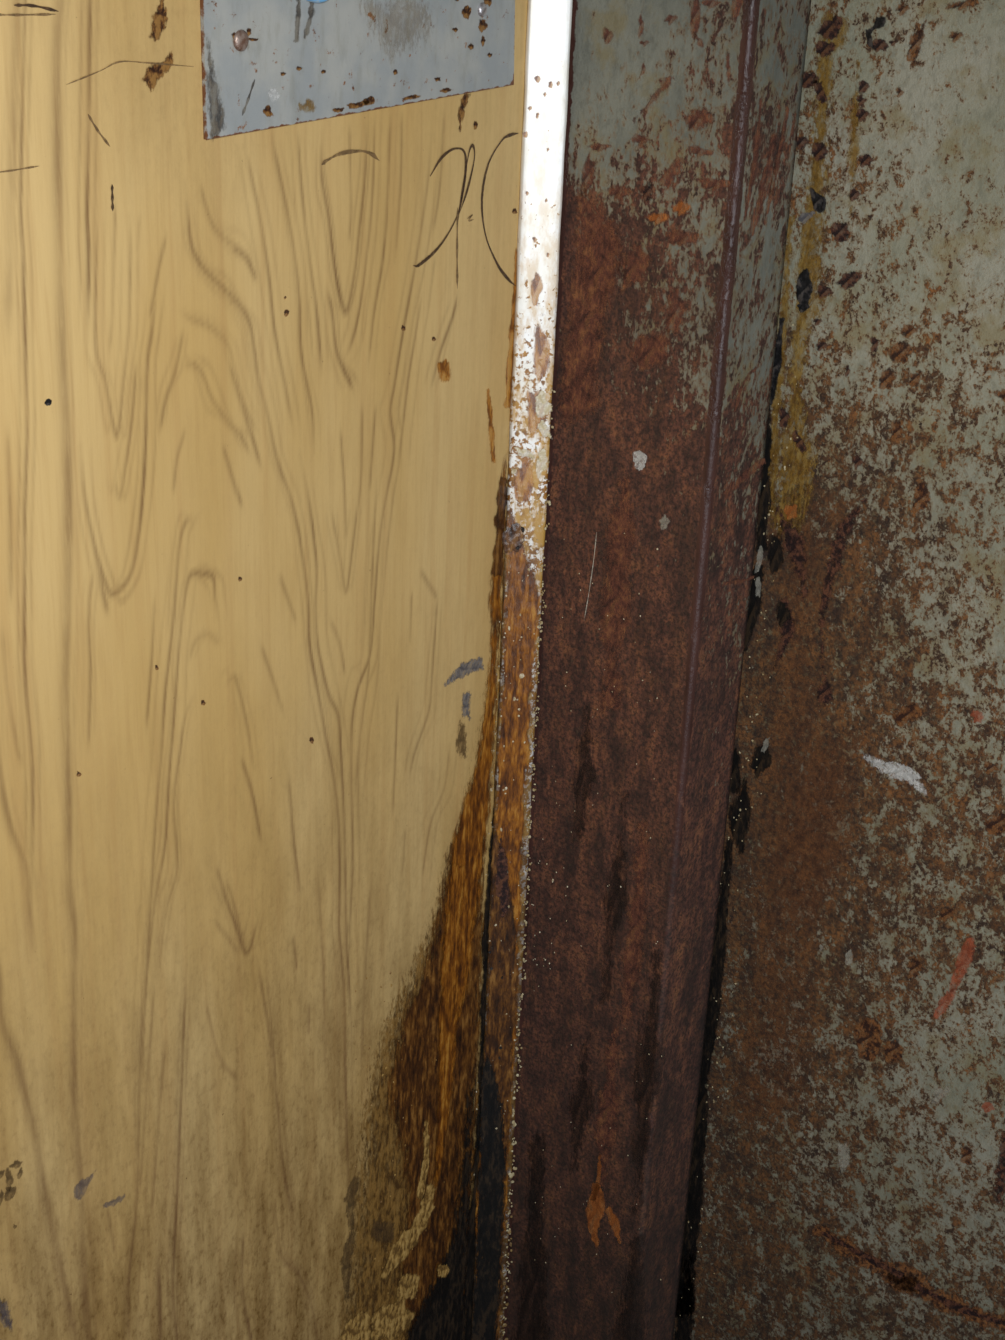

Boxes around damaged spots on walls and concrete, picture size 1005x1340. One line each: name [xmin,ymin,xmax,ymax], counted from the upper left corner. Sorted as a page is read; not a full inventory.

corrosion [945,0,979,10]
corrosion [907,20,926,66]
corrosion [580,143,611,195]
corrosion [607,146,713,223]
corrosion [531,273,543,305]
corrosion [527,325,550,437]
corrosion [723,13,873,707]
corrosion [870,325,922,389]
corrosion [912,483,930,513]
peeling [501,389,556,1340]
corrosion [853,1017,903,1063]
corrosion [586,1155,621,1246]